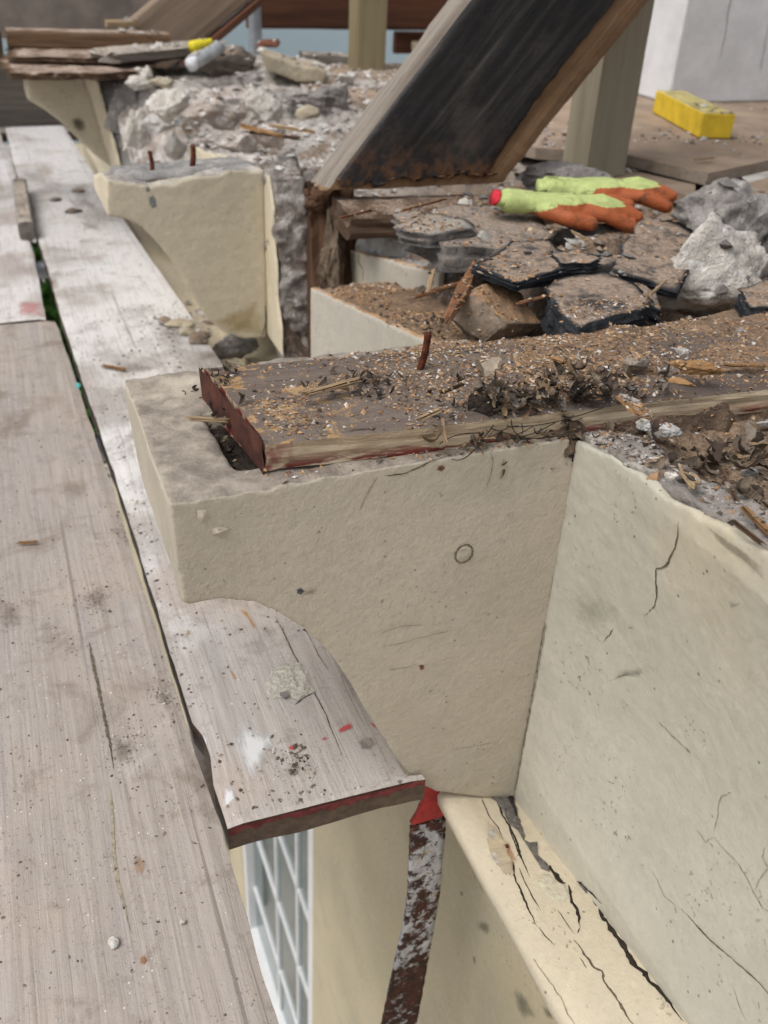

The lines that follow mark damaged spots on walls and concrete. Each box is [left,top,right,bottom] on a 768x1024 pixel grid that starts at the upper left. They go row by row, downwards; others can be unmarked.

crack [644,525,678,616]
crack [456,622,682,1024]
crack [698,792,768,911]
crack [653,873,768,1015]